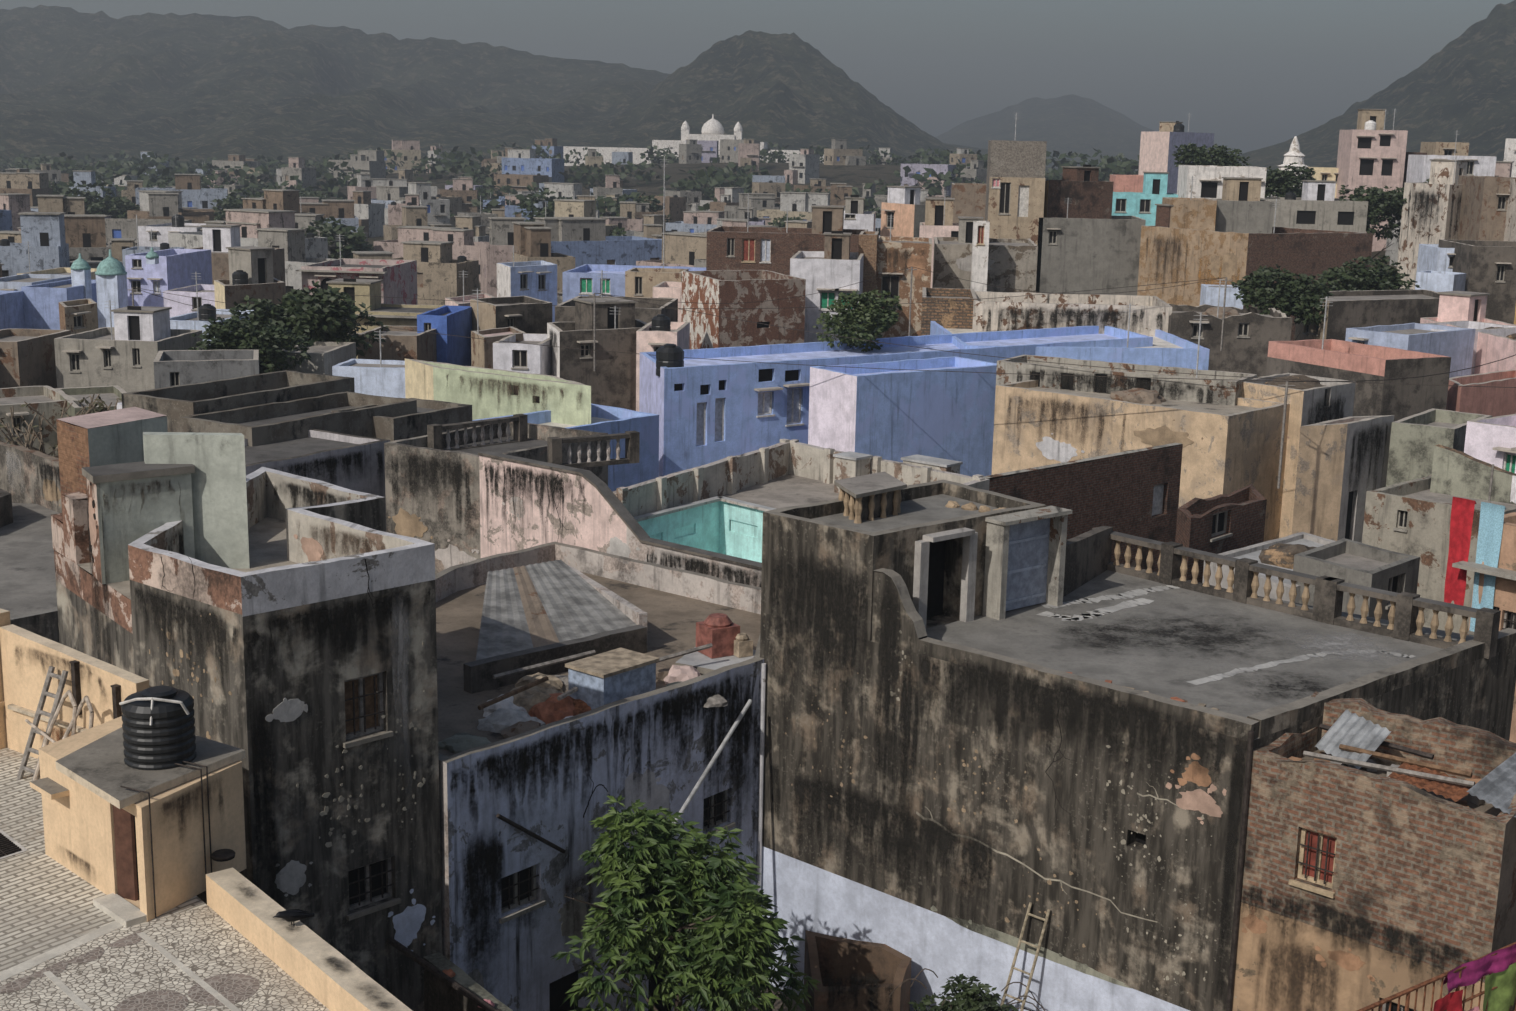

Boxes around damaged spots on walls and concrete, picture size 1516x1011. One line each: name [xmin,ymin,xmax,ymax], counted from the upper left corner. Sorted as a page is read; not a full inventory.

damp [135,589,431,727]
peeling [265,698,308,722]
peeling [319,690,426,853]
damp [451,554,1470,971]
peeling [1103,741,1227,877]
peeling [275,860,313,897]
peeling [388,889,435,951]
peeling [1126,888,1216,995]
damp [1260,944,1336,1011]